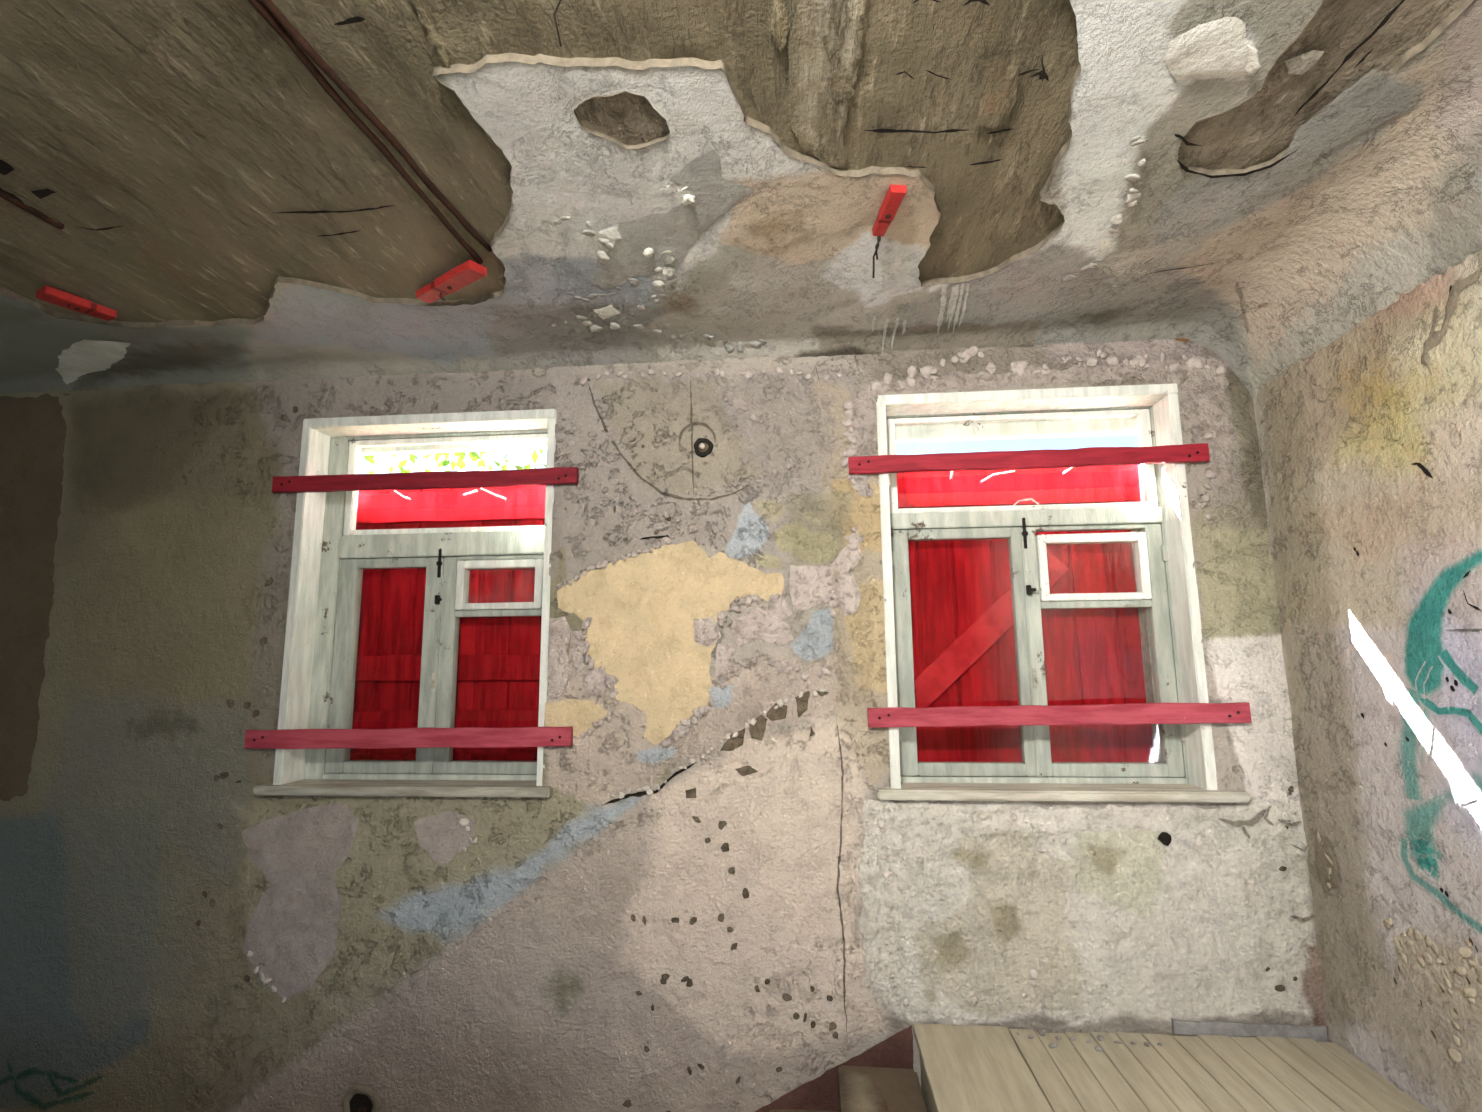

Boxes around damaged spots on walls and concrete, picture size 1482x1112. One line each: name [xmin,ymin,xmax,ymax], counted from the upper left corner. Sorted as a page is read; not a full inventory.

spalling [1165,0,1474,175]
spalling [0,0,1081,805]
peeling [242,803,359,1003]
peeling [414,810,477,866]
spalling [692,816,735,874]
spalling [718,913,738,950]
crack [836,720,848,1043]